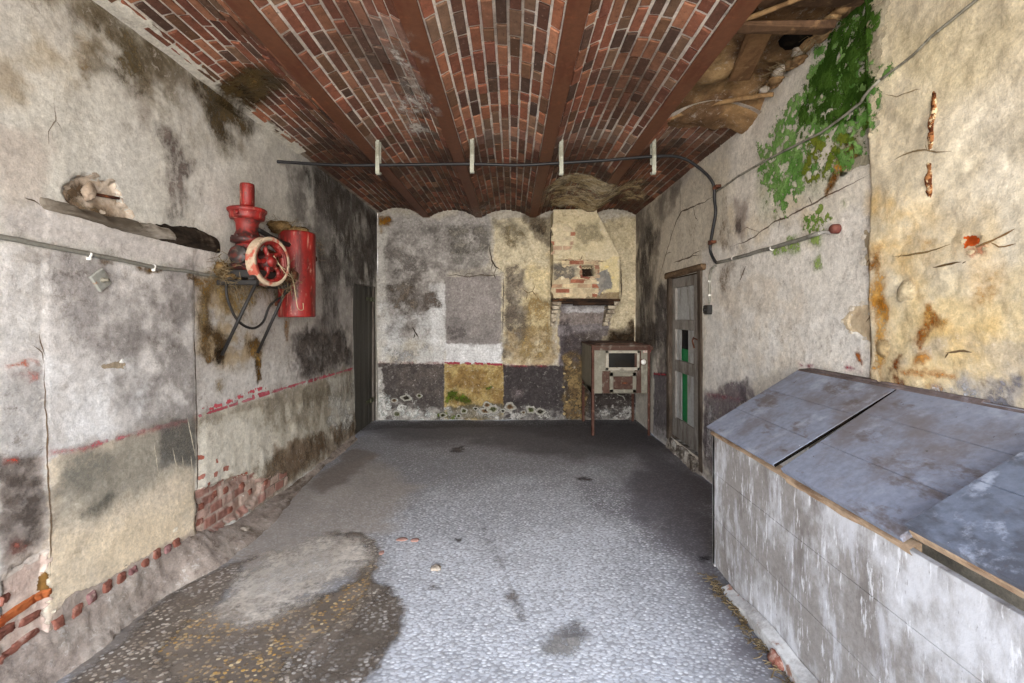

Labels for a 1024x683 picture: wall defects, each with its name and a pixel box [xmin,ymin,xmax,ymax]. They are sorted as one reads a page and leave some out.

water stain [192,76,254,143]
water stain [199,294,210,333]
water stain [297,166,442,406]
flaking render [551,223,615,299]
crack [659,199,708,279]
crack [731,175,868,282]
flaking render [841,301,871,342]
crack [864,229,1014,271]
crack [34,334,52,566]
water stain [265,416,356,490]
flaking render [0,455,288,665]
water stain [71,532,406,683]